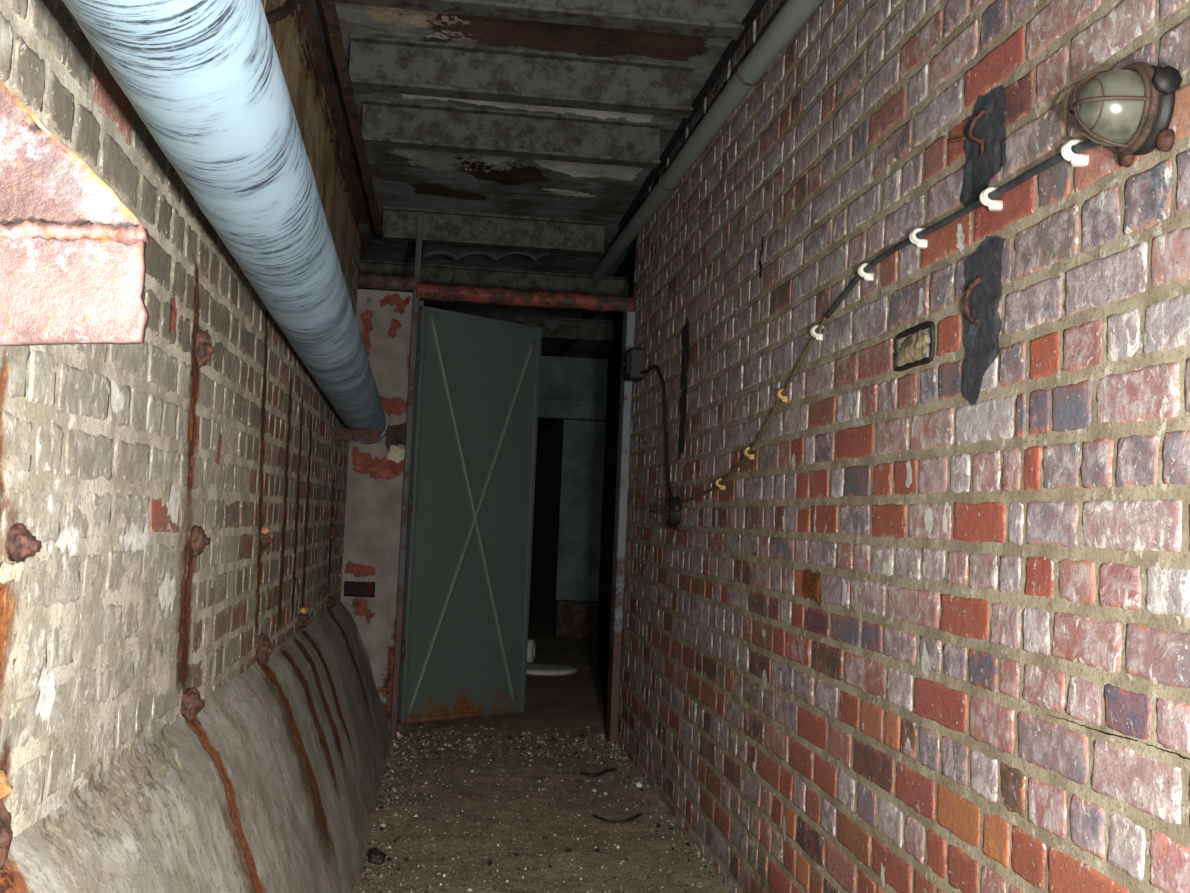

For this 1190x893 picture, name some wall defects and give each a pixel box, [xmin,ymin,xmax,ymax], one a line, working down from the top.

rust [0,358,15,527]
rust [188,263,200,497]
peeling [352,397,408,480]
peeling [361,294,411,355]
rust [0,546,23,690]
rust [177,517,196,688]
peeling [344,561,375,577]
peeling [352,597,375,623]
rust [0,857,28,893]
rust [186,718,264,893]
rust [282,631,352,793]
crack [1047,715,1190,760]